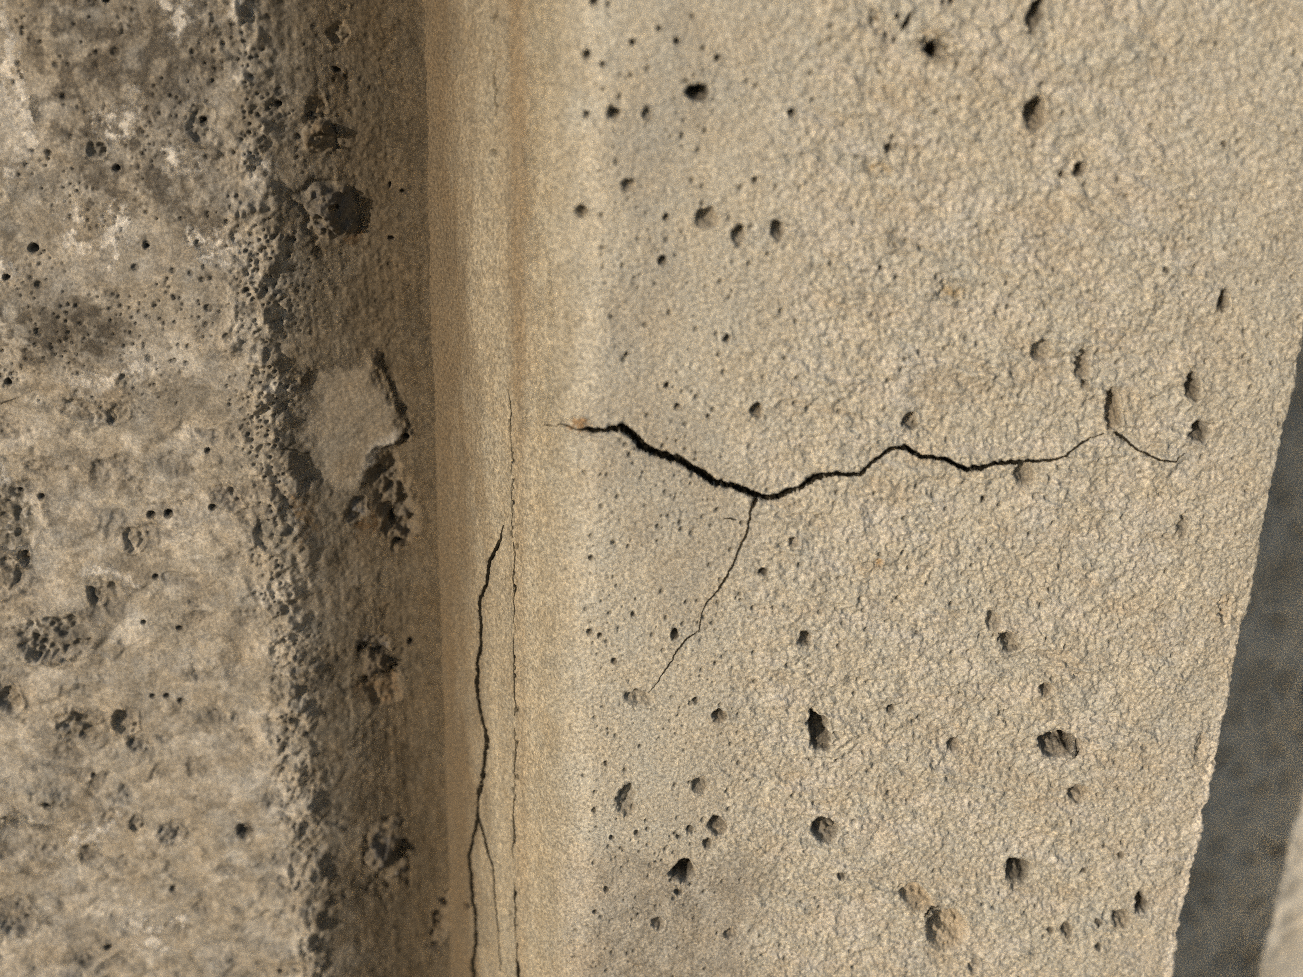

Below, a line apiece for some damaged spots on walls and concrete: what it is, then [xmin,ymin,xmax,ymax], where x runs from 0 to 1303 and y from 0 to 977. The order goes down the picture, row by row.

crack [467,391,520,977]
crack [543,423,1185,693]